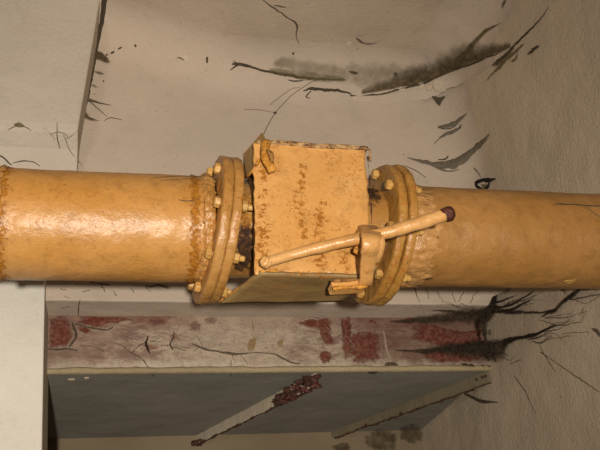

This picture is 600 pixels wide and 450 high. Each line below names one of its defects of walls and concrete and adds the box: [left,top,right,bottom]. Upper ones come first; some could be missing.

crack [263,0,299,43]
crack [230,61,351,98]
leakage [487,44,523,80]
crack [0,155,40,166]
crack [51,131,76,157]
crack [48,285,301,376]
corrosion [191,374,323,447]